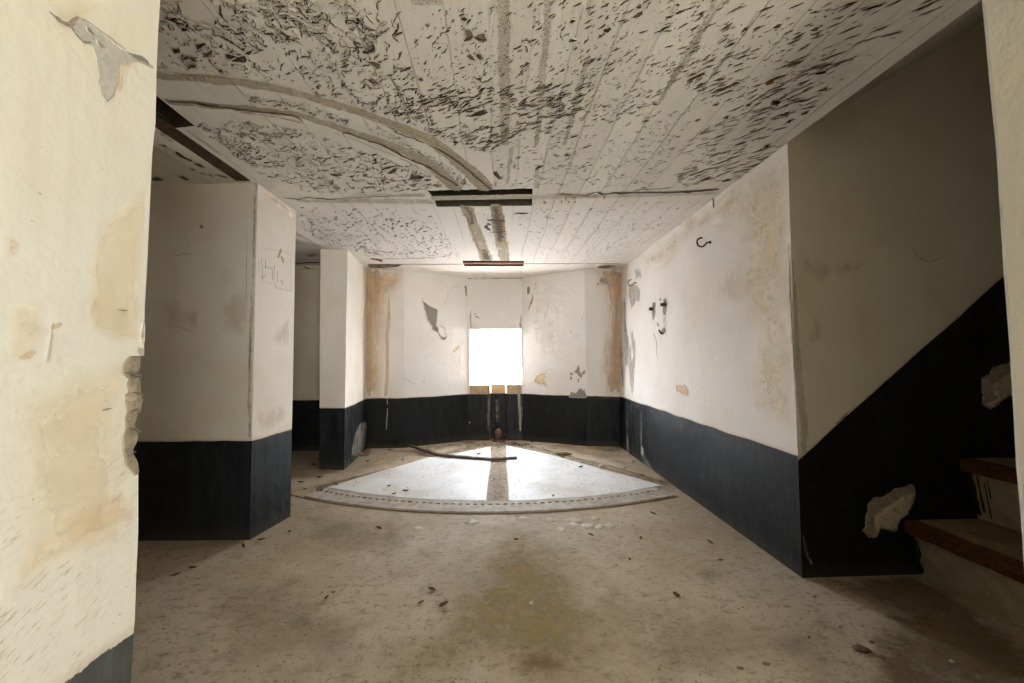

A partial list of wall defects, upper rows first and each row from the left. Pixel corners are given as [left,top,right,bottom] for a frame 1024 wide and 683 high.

peeling [50,0,943,269]
flaking render [422,285,467,341]
spalling [122,321,145,476]
flaking render [569,366,587,398]
flaking render [981,362,1012,410]
flaking render [862,484,916,538]